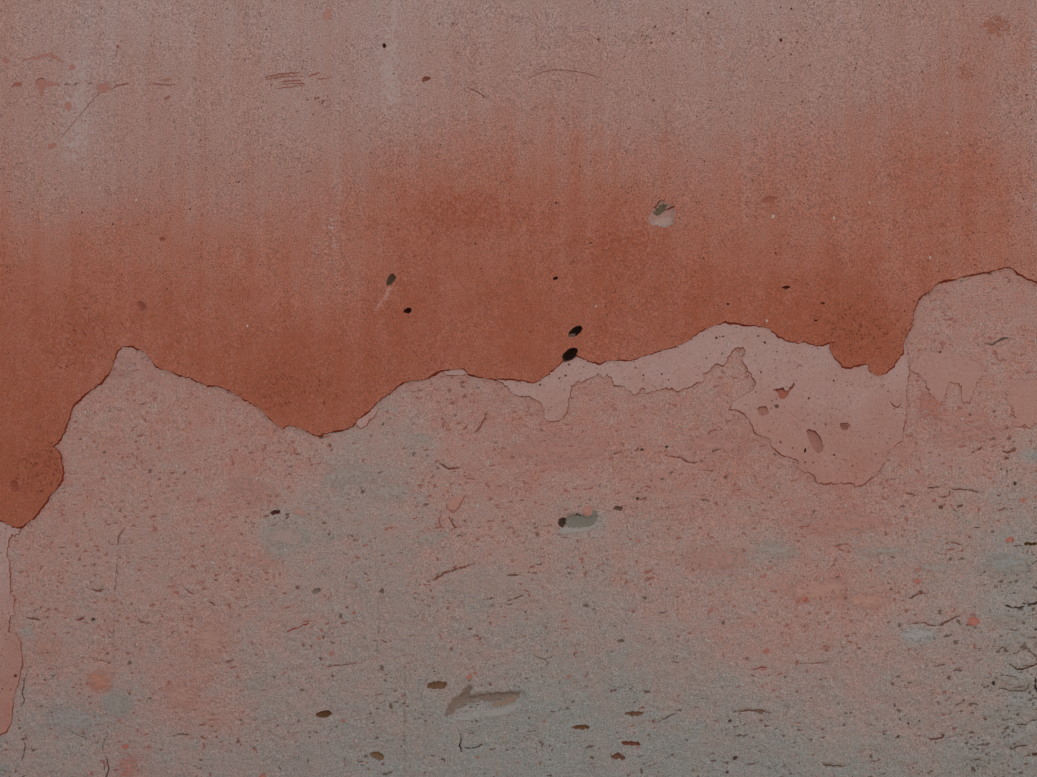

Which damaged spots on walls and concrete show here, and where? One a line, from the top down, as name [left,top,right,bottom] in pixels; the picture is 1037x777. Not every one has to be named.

spalling [648,199,675,228]
flaking render [0,267,1037,777]